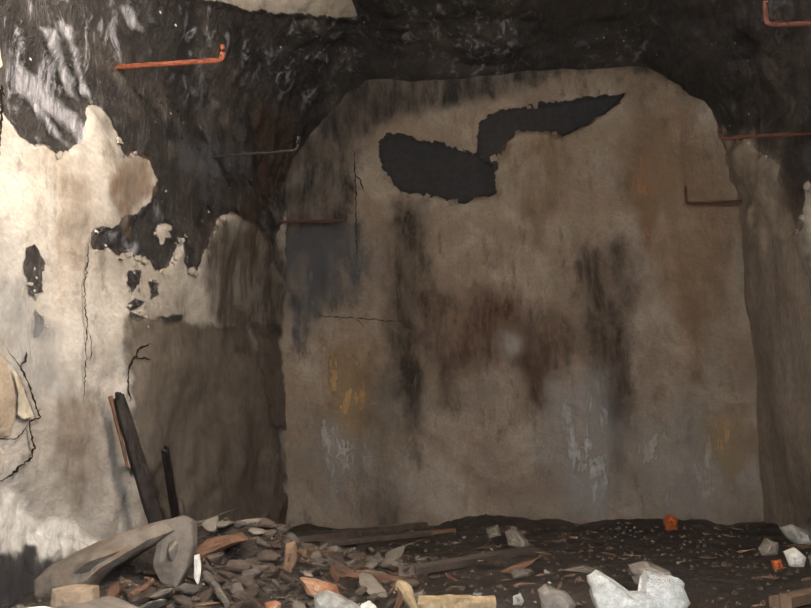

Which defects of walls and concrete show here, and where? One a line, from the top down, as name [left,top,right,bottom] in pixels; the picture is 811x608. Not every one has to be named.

crack [0,67,8,146]
spalling [0,0,367,328]
spalling [379,89,631,207]
spalling [33,310,48,338]
damp [388,202,430,420]
damp [561,249,632,520]